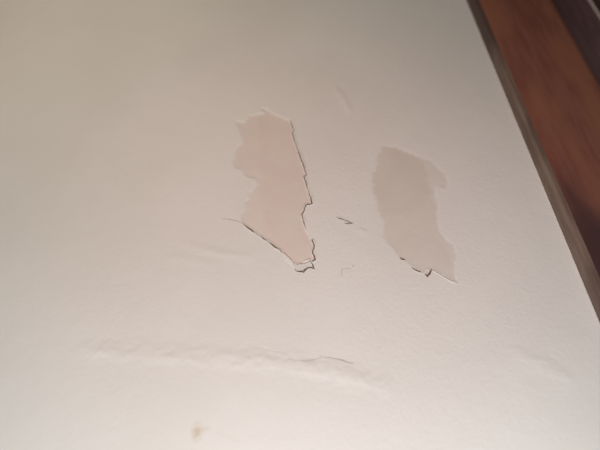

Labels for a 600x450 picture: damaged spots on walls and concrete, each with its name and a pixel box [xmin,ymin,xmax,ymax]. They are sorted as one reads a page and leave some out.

peeling [223,106,318,273]
peeling [370,144,459,285]